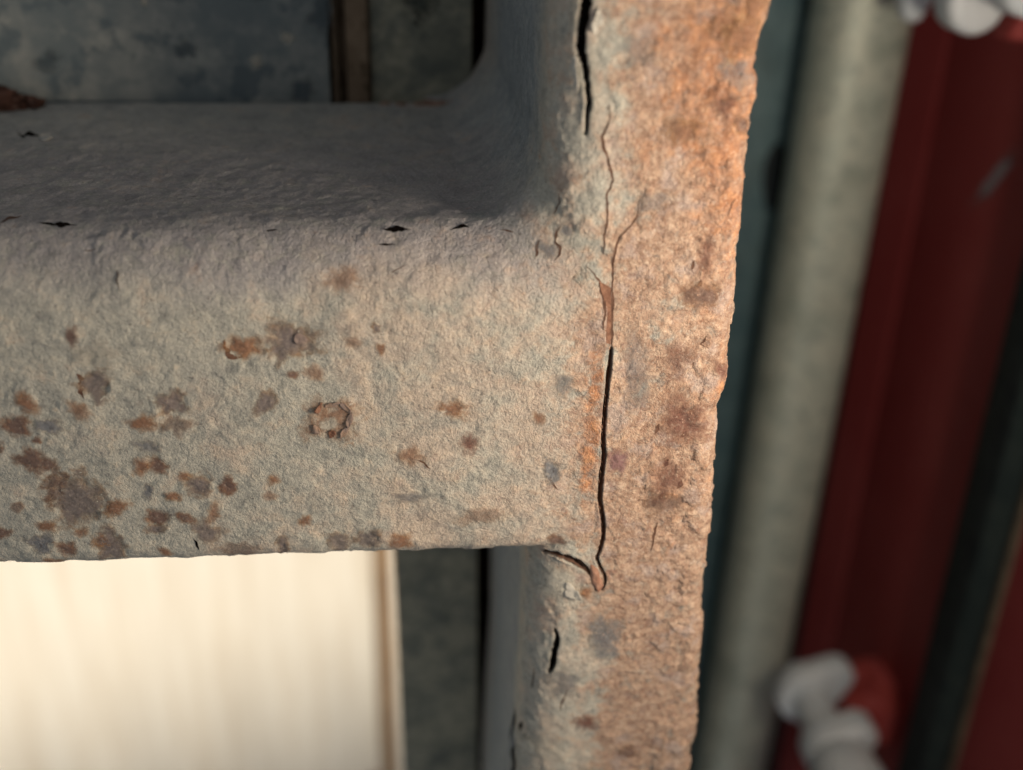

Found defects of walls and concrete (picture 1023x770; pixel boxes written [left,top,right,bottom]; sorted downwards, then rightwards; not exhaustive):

crack [535,193,572,259]
crack [544,0,642,592]
rust [682,285,719,308]
rust [222,318,319,379]
rust [1,392,64,501]
rust [136,458,168,475]
rust [219,475,237,496]
rust [312,402,354,439]
rust [45,529,86,563]
rust [146,509,196,525]
crack [531,629,560,689]
crack [509,710,539,770]